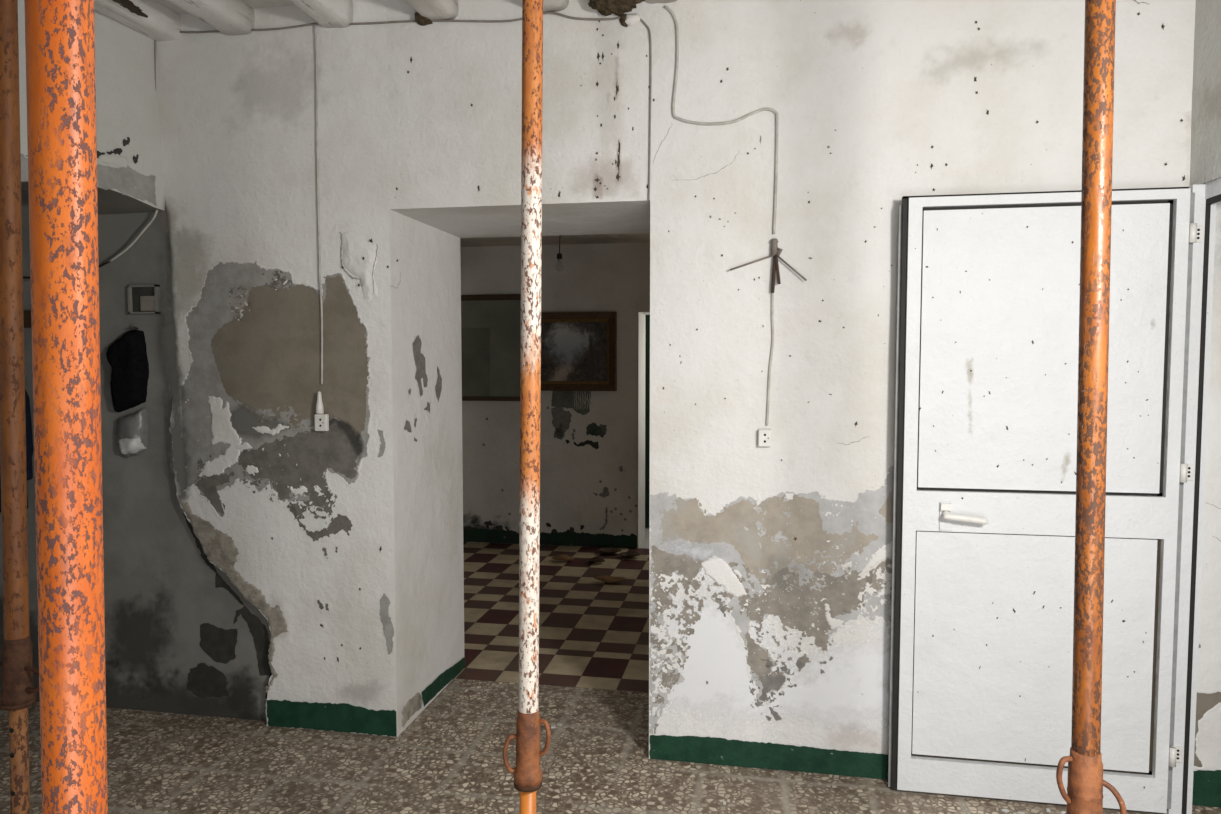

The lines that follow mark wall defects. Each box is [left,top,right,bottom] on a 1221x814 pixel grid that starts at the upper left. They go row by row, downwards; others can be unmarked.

peeling [112,0,148,18]
peeling [404,335,442,442]
peeling [547,391,607,449]
peeling [169,259,386,724]
peeling [594,463,894,734]
damp [29,616,40,702]
damp [106,605,258,720]
peeling [1194,689,1221,770]